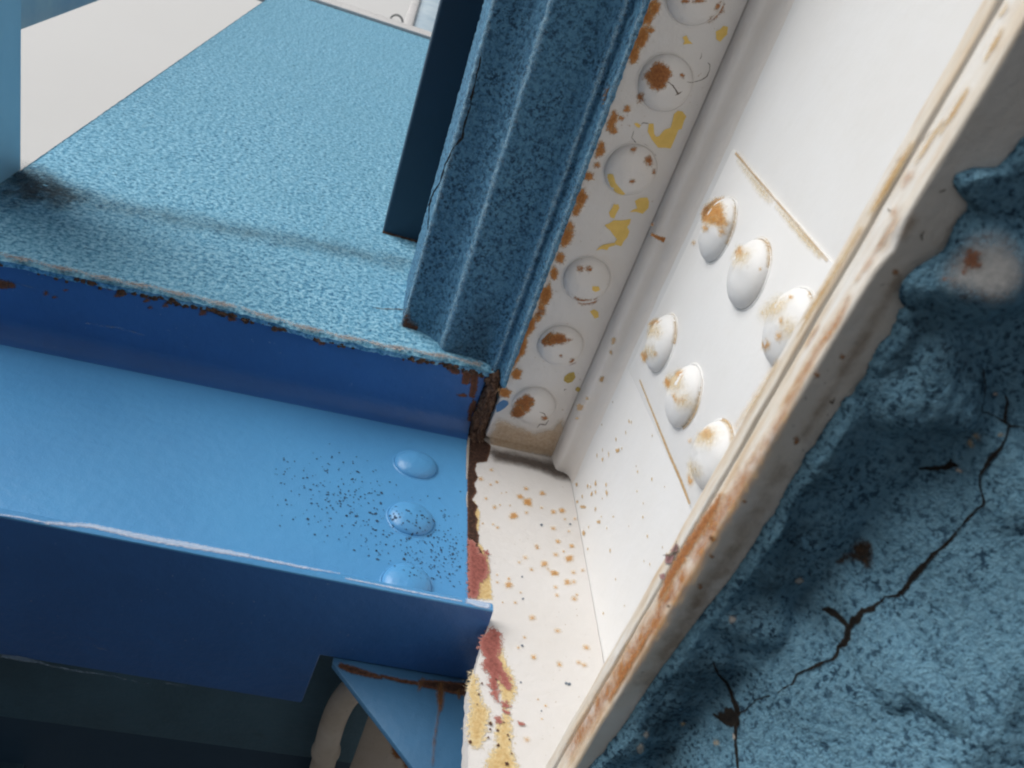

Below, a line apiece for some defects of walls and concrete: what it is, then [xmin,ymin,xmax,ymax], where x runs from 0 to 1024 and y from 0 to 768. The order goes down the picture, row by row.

rust [628,0,661,65]
rust [701,198,742,259]
rust [37,273,287,332]
rust [402,62,691,595]
rust [574,474,747,744]
crack [713,369,1024,768]
rust [338,663,497,712]
peeling [461,626,525,768]